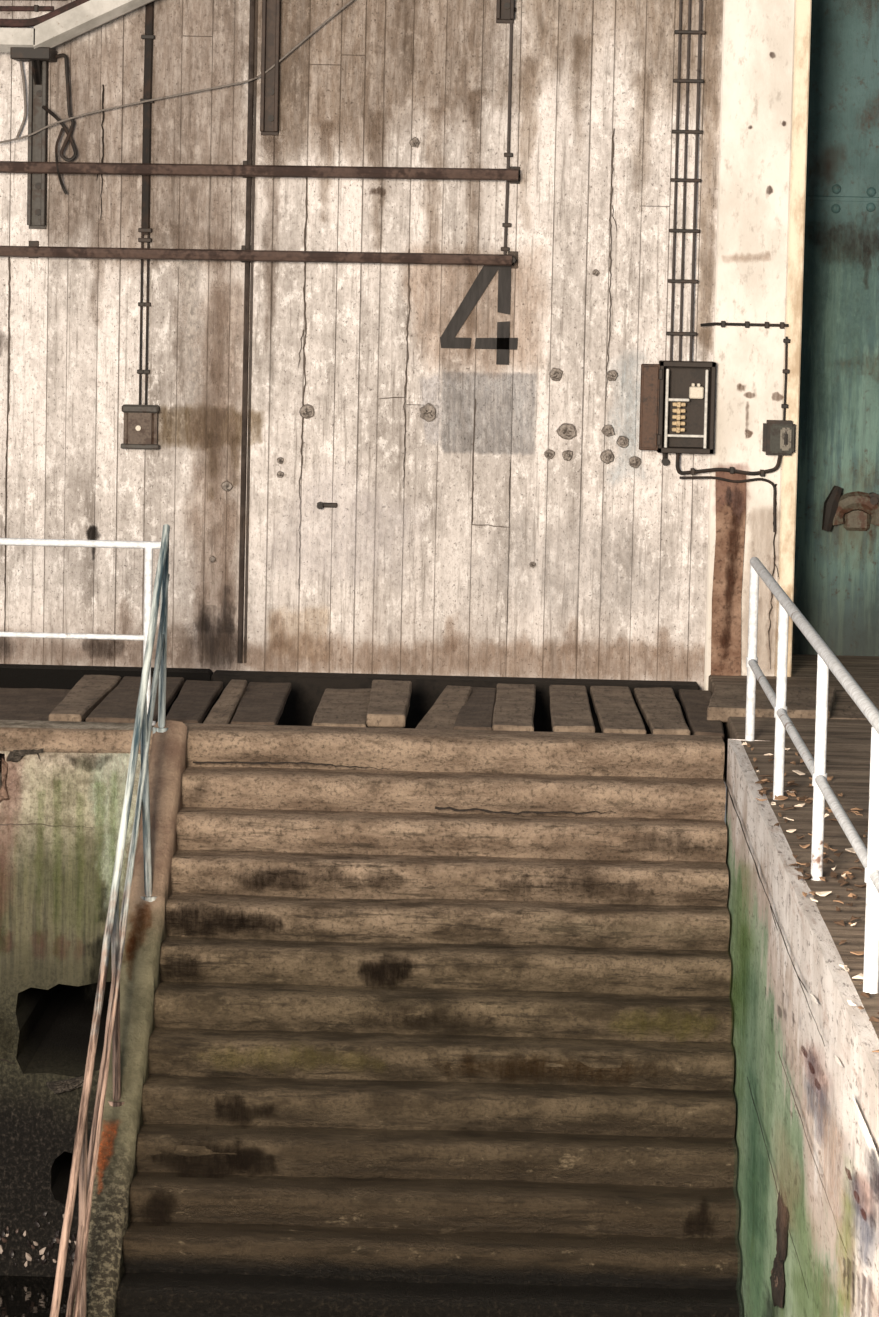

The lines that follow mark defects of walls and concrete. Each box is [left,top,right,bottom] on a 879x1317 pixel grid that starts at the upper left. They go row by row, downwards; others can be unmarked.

leakage [93,753,139,885]
leakage [843,1258,866,1317]